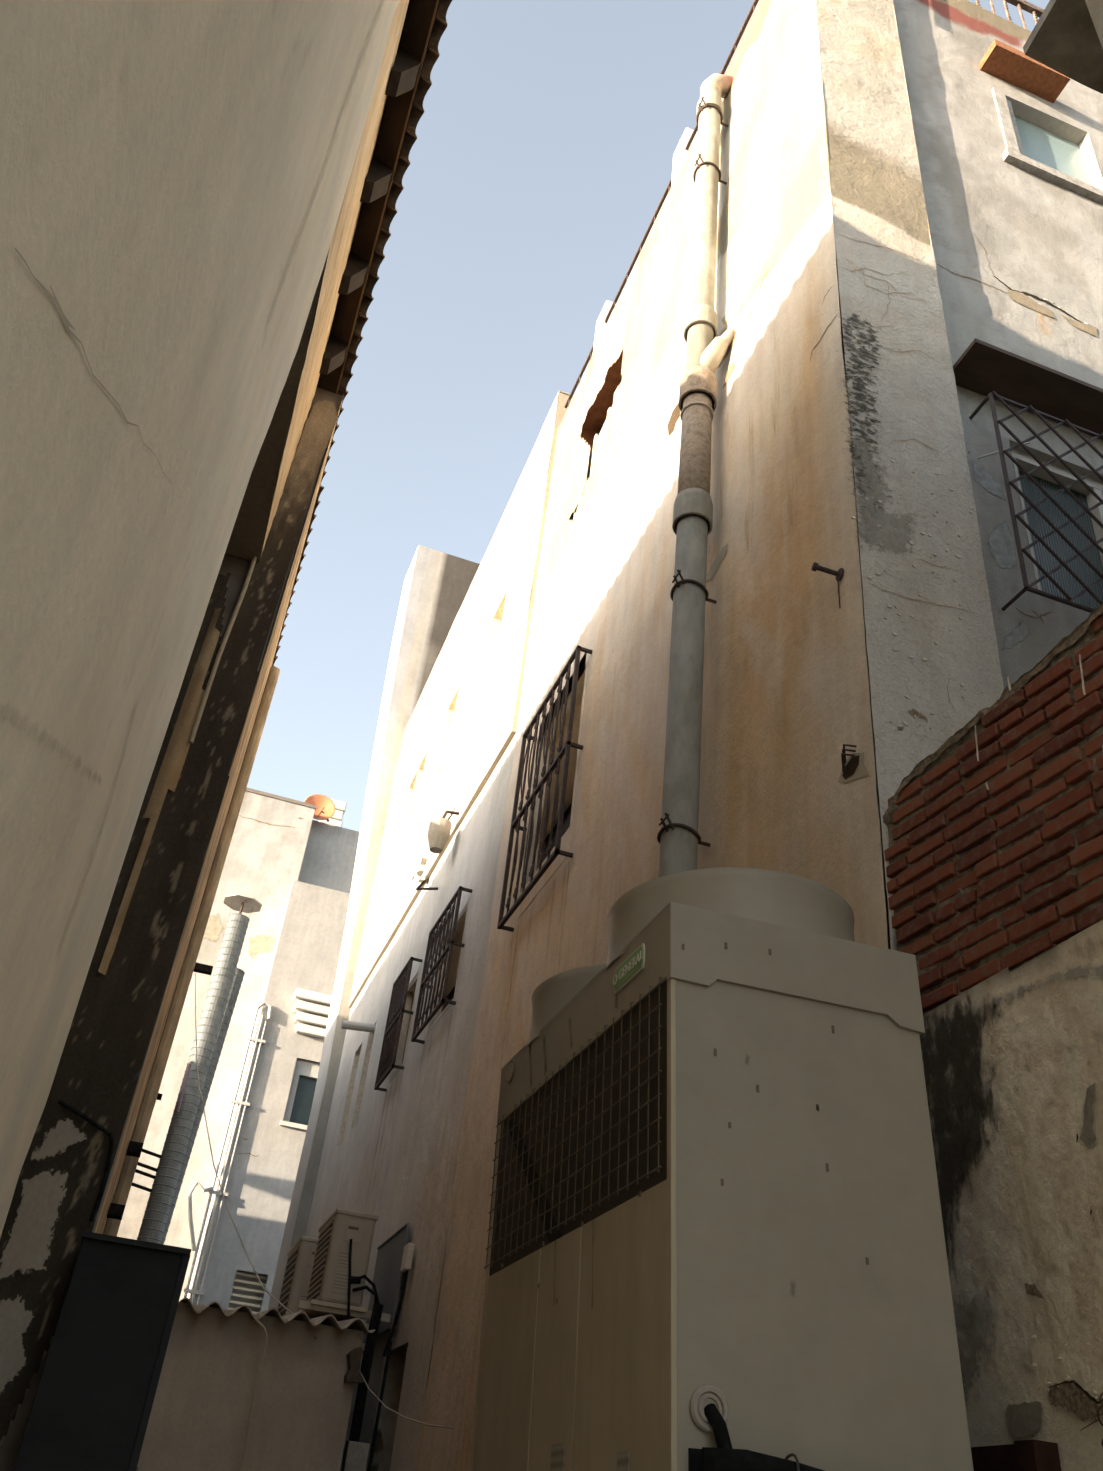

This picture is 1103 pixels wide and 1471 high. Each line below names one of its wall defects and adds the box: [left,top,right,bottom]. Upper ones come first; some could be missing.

crack [810,232,1098,360]
crack [15,248,172,484]
mould [838,311,913,552]
crack [870,583,974,613]
leakage [920,966,1103,1265]
peeling [0,1118,87,1394]
leakage [954,1292,994,1406]
spalling [1025,1283,1043,1298]
spalling [1005,1357,1103,1438]